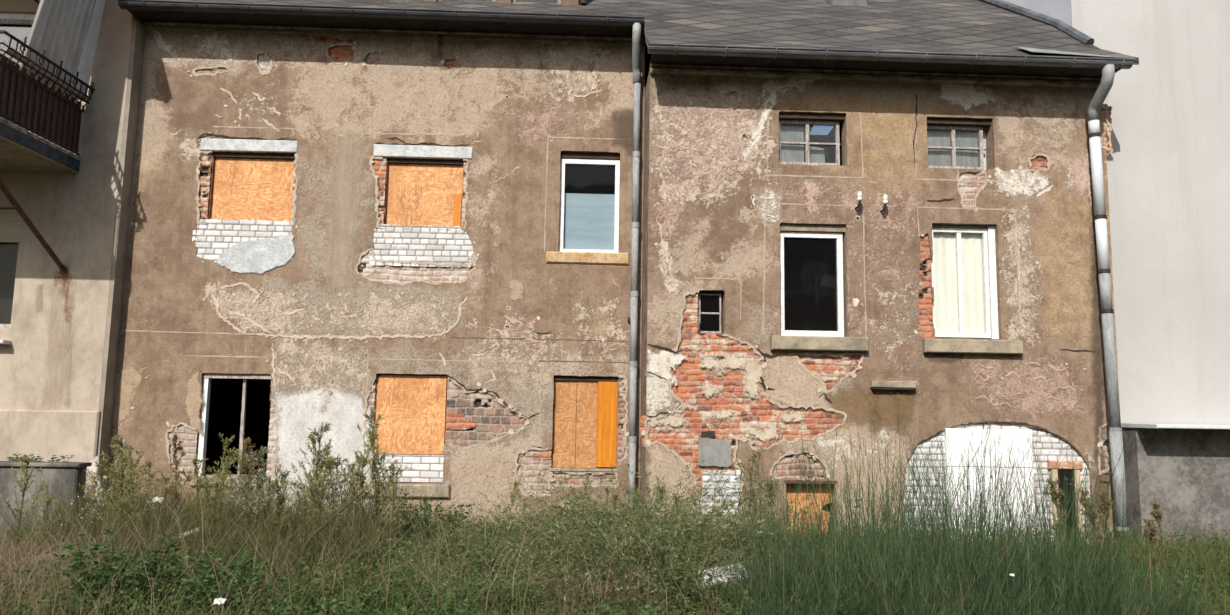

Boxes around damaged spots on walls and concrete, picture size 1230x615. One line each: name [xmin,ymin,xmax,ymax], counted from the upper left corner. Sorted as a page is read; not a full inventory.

spalling [301,35,383,67]
spalling [369,156,387,229]
crack [911,100,919,162]
peeling [939,84,996,111]
peeling [1068,103,1113,206]
spalling [512,79,865,529]
spalling [914,234,933,338]
peeling [956,153,1053,343]
peeling [112,365,148,428]
spalling [164,372,202,478]
peeling [203,248,476,478]
spalling [439,279,540,449]